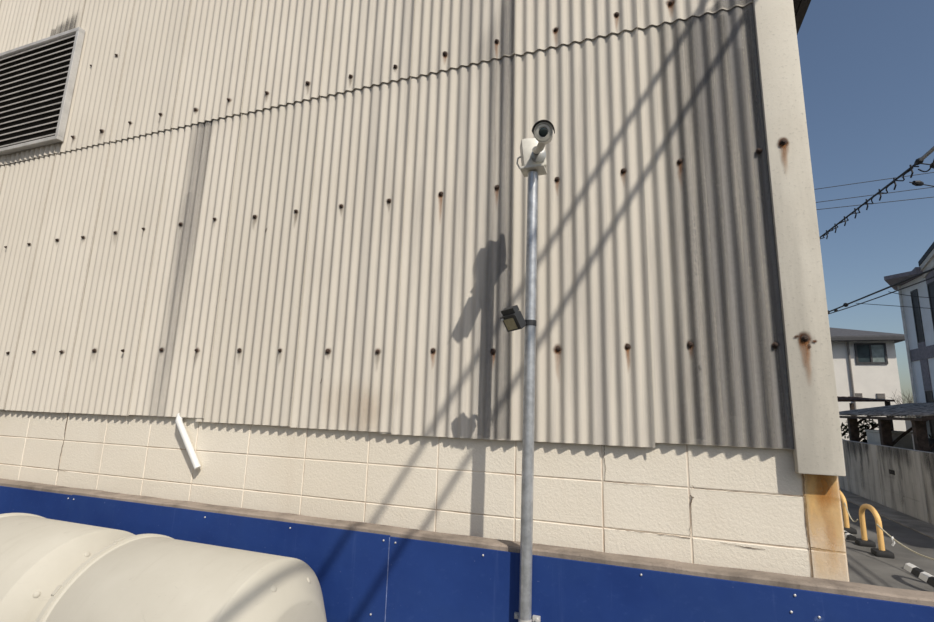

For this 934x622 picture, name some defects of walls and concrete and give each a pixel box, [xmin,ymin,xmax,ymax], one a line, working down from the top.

leakage [503,0,514,129]
leakage [690,0,795,449]
corrosion [794,333,817,362]
crack [612,474,846,577]
corrosion [805,474,843,540]